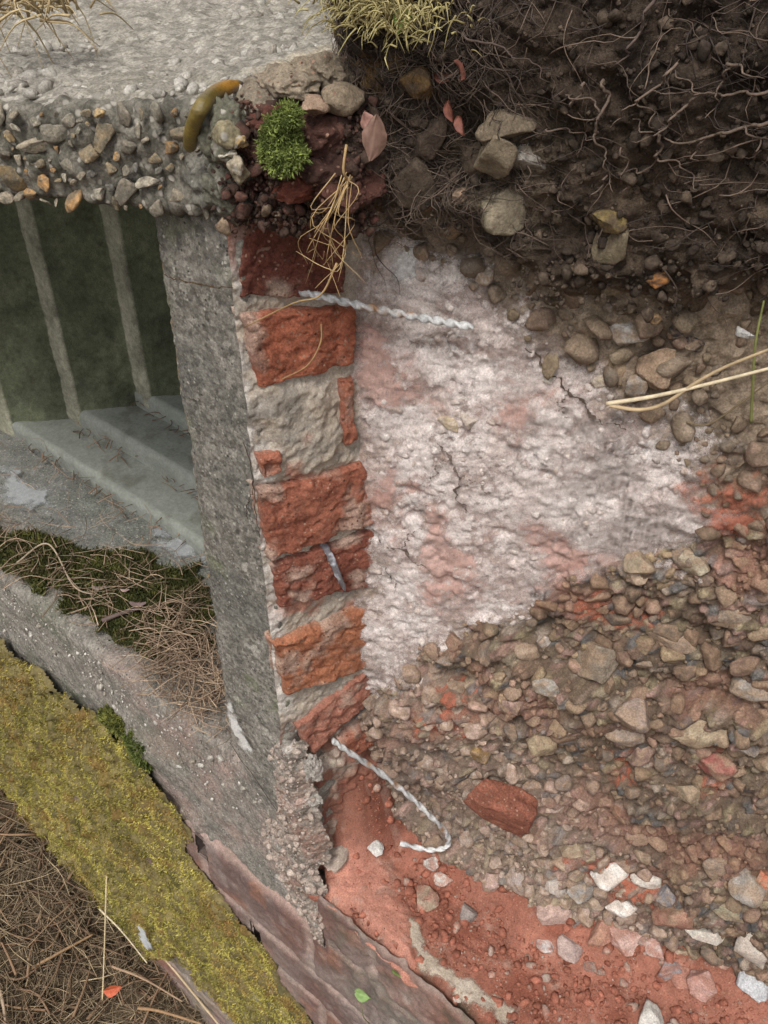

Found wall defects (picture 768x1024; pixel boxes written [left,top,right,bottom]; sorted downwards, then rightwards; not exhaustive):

crack [525,348,626,430]
crack [429,443,487,513]
flaking render [261,739,349,948]